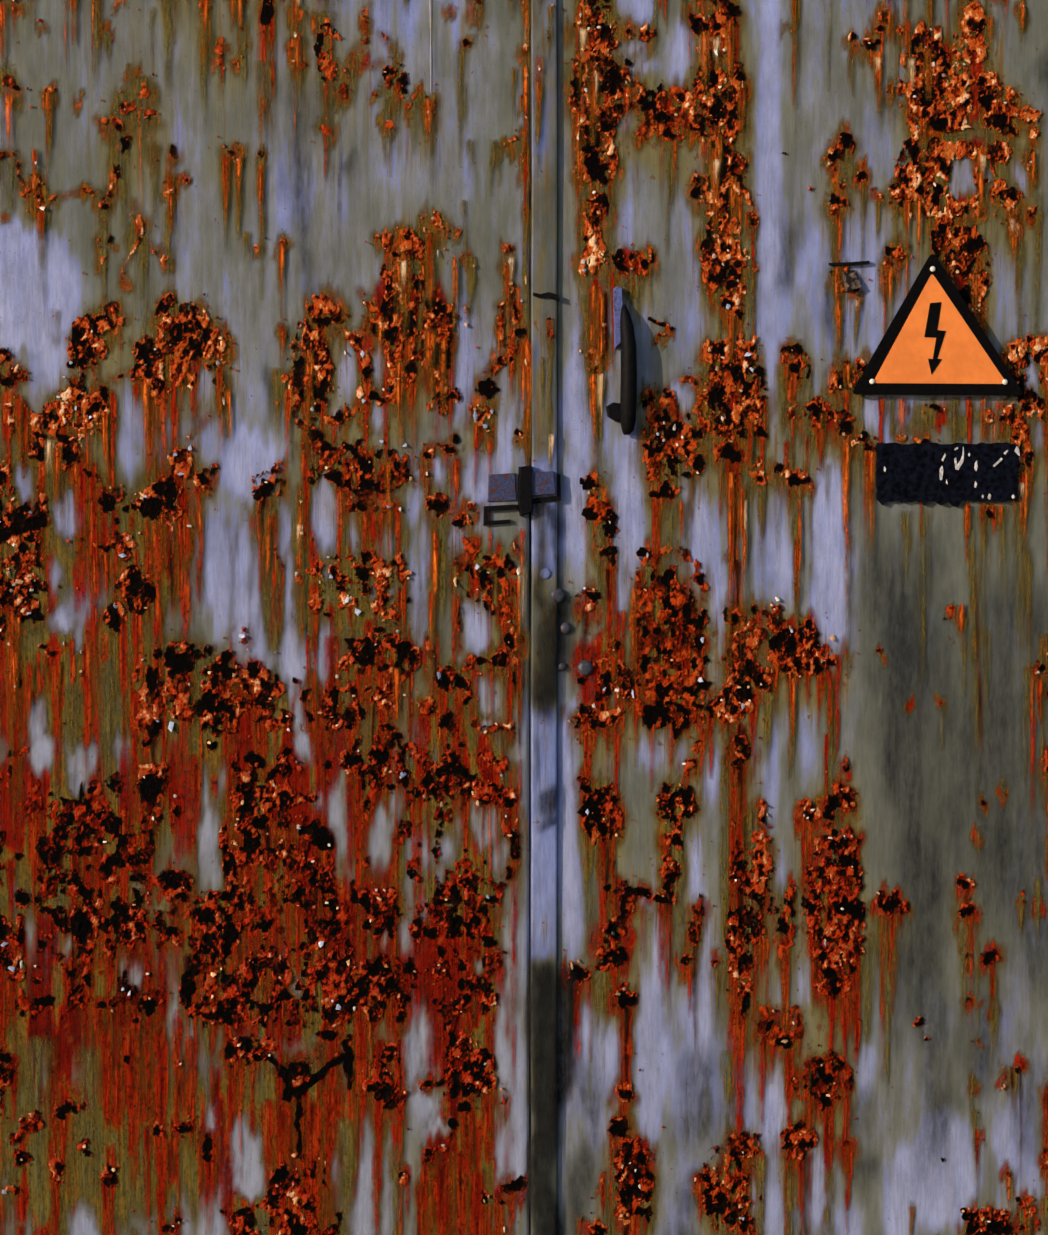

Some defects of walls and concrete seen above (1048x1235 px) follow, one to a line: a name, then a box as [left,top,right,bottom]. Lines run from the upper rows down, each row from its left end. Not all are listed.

rust [0,0,47,145]
rust [18,81,114,263]
rust [64,0,77,49]
rust [91,0,252,174]
rust [284,0,439,187]
rust [442,0,484,134]
rust [535,55,543,162]
rust [0,143,554,1235]
rust [538,0,1048,1235]
crack [267,1029,355,1153]